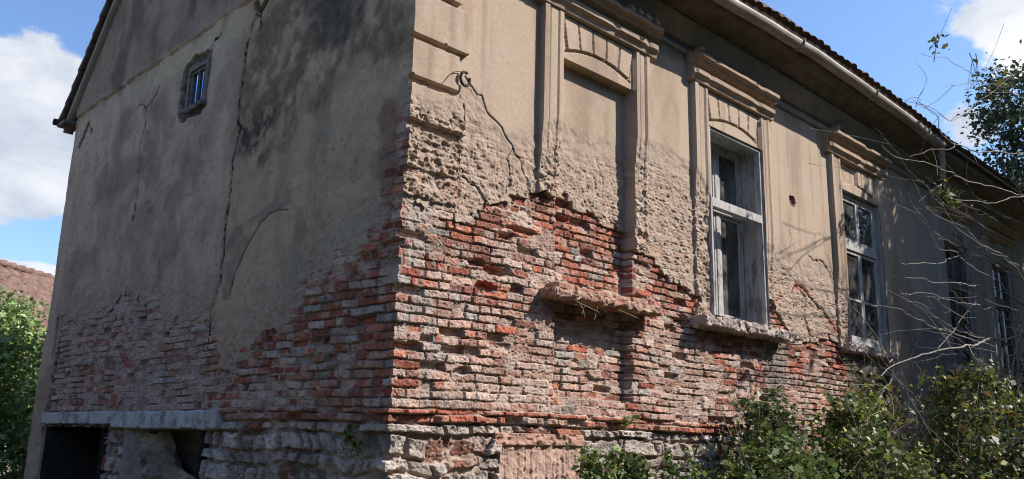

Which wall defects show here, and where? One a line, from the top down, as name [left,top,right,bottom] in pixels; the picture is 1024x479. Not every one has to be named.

crack [137,86,160,199]
crack [207,8,264,349]
crack [457,76,527,203]
spalling [34,78,962,479]